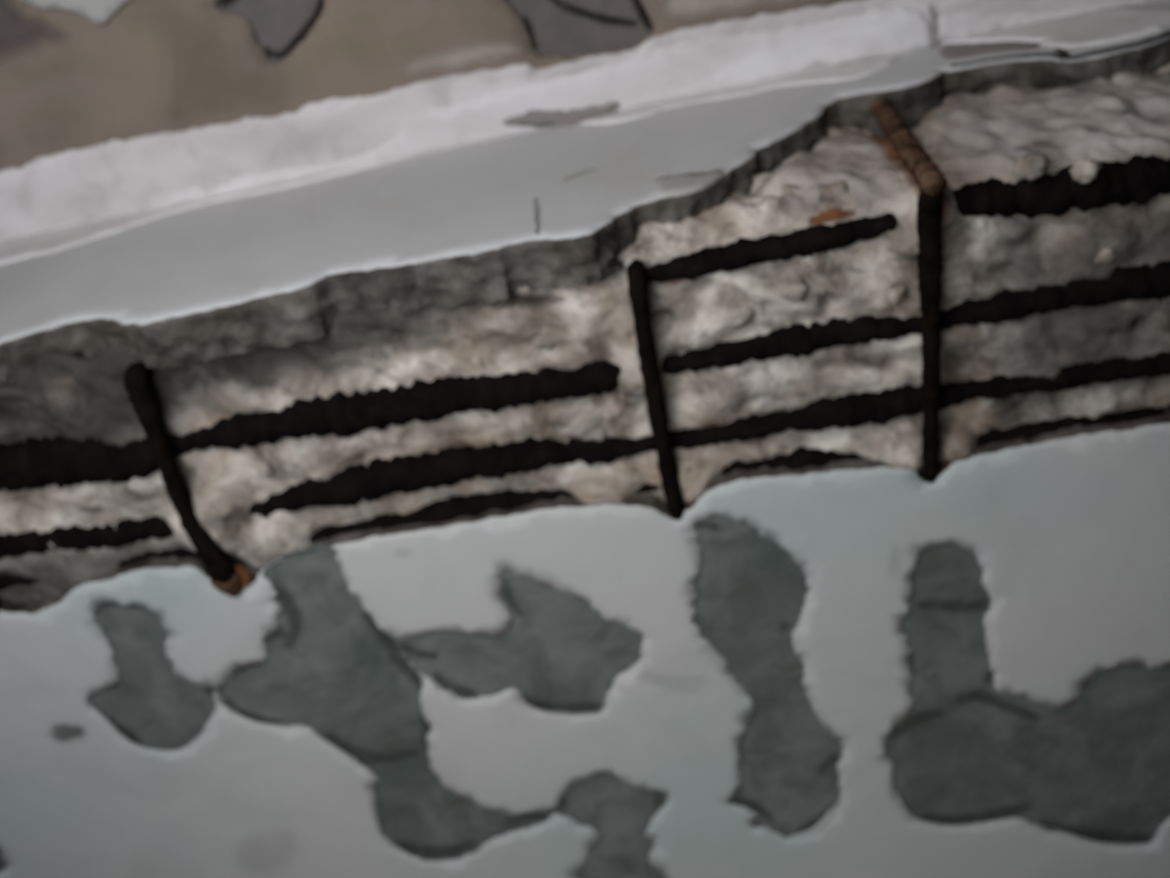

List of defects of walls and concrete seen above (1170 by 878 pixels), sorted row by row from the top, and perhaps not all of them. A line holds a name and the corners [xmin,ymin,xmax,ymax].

peeling [0,0,1170,265]
spalling [910,64,1170,311]
spalling [0,470,197,579]
spalling [89,126,924,878]
spalling [941,320,1068,385]
spalling [939,375,1170,462]
spalling [1082,301,1170,363]
peeling [887,545,1170,845]